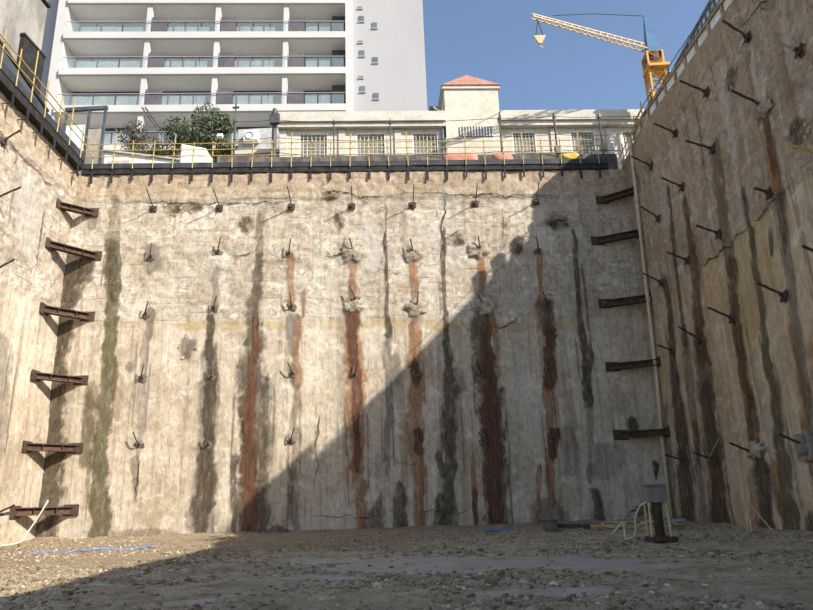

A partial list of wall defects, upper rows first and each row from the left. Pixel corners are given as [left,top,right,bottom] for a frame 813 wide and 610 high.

damp [35,253,94,538]
damp [82,238,134,538]
crack [112,200,296,215]
damp [191,314,220,533]
rust [230,211,276,533]
rust [344,311,369,529]
rust [405,314,428,526]
damp [433,228,464,525]
rust [467,311,514,525]
rust [535,252,562,523]
damp [572,229,594,408]
rust [681,196,731,523]